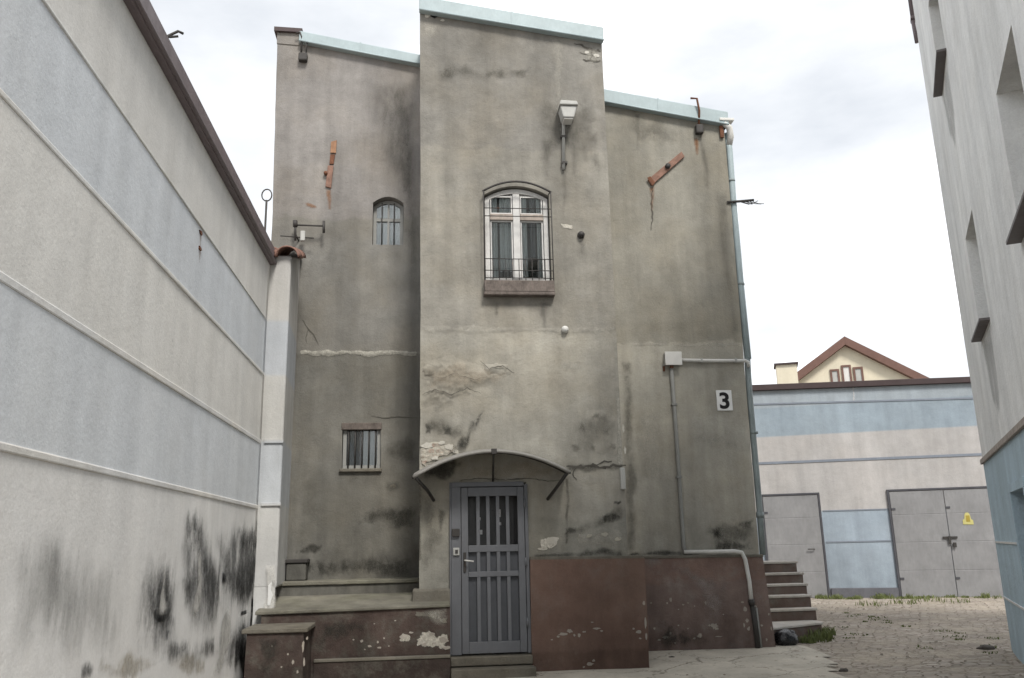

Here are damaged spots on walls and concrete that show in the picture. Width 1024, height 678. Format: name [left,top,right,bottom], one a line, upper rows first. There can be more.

spalling [420,441,459,467]
crack [461,460,626,482]
spalling [538,537,559,550]
damp [186,517,257,671]
damp [148,575,199,667]
peeling [352,612,450,650]